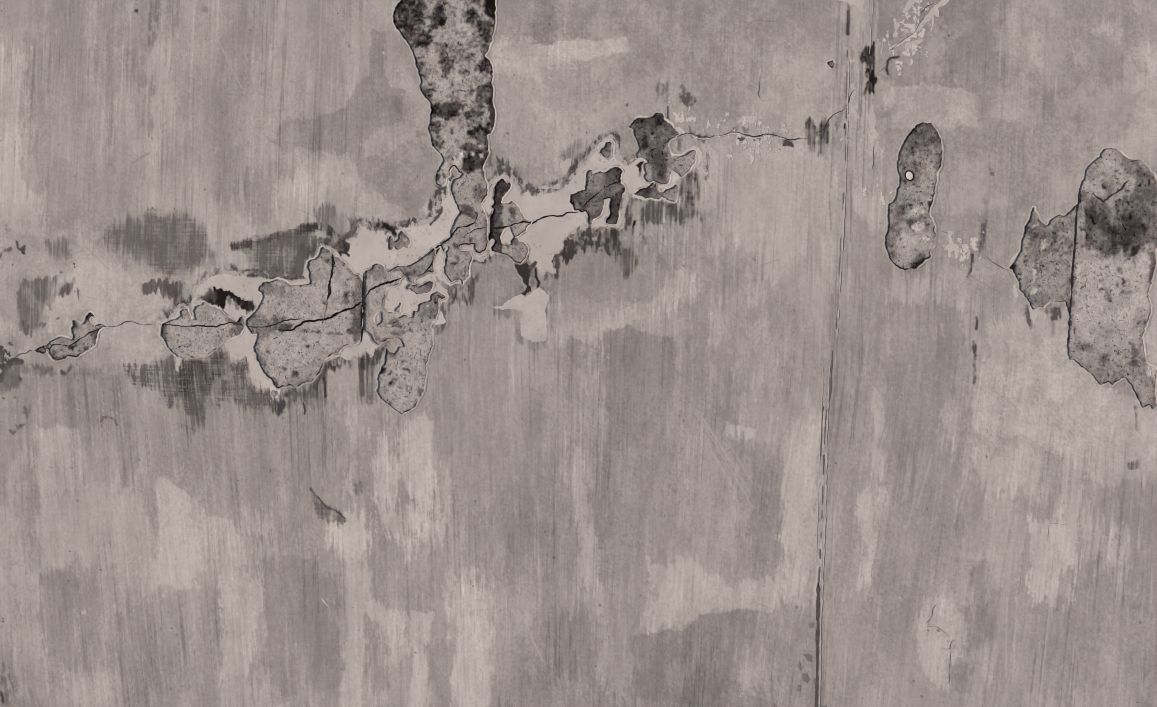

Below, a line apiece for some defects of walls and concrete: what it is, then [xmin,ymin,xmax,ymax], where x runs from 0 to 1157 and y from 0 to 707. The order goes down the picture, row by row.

flaking render [31,310,109,363]
flaking render [155,0,702,416]
crack [13,90,854,360]
flaking render [883,120,977,272]
flaking render [1007,146,1157,411]